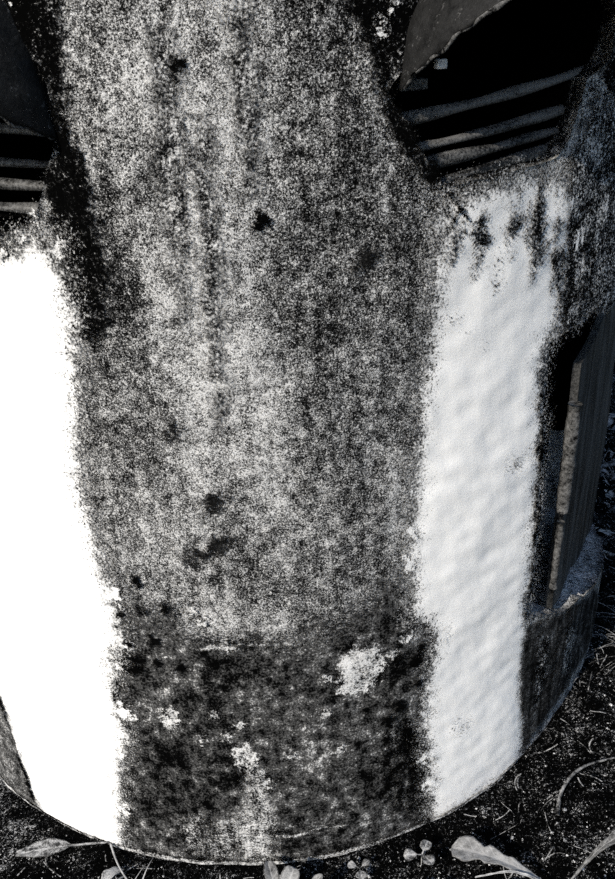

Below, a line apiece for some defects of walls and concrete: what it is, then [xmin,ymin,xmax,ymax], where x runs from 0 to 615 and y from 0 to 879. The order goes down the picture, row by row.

water stain [5,0,117,352]
water stain [142,0,273,435]
water stain [341,0,615,339]
water stain [161,417,184,442]
water stain [56,560,505,865]